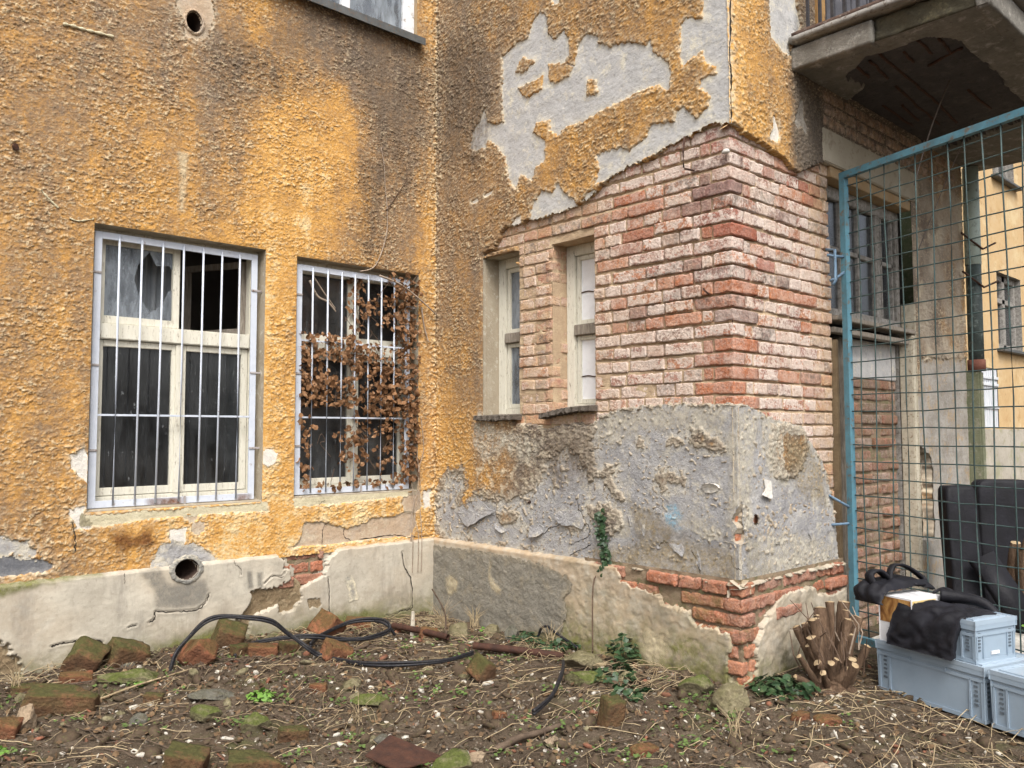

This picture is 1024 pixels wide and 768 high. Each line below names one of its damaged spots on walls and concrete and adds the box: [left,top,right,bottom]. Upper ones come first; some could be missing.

crack [727,0,735,118]
flaking render [166,0,848,692]
peeling [0,536,53,577]
crack [128,594,209,628]